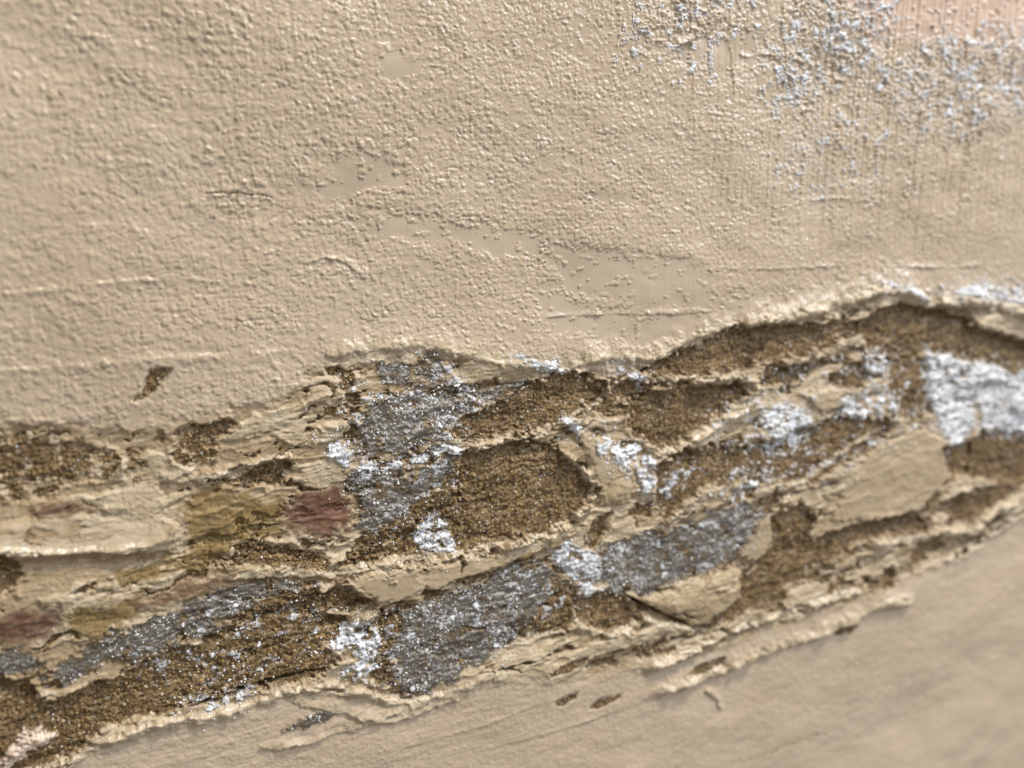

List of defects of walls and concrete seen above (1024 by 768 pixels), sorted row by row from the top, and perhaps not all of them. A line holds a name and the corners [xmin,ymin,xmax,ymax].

damp [604,0,1024,208]
spalling [0,279,1024,768]
damp [0,338,1024,732]